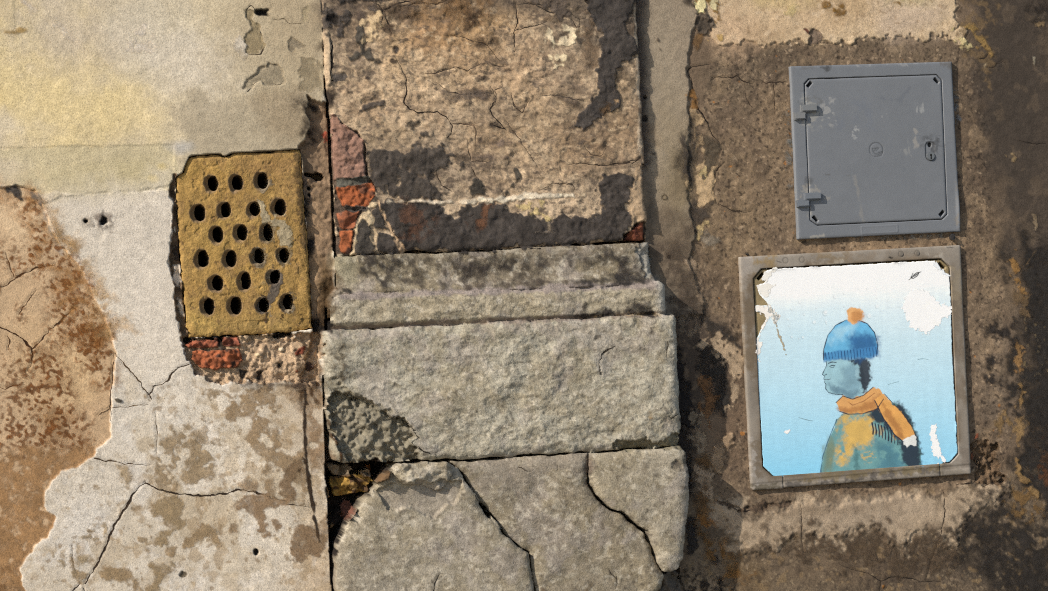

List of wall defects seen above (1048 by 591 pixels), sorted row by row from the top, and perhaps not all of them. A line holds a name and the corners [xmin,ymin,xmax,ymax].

crack [373,0,447,25]
flaking render [693,0,723,50]
crack [397,0,641,191]
crack [0,253,69,390]
flaking render [169,173,326,386]
flaking render [304,114,585,256]
peeling [619,165,652,279]
crack [71,353,307,591]
spalling [324,392,437,556]
damp [685,517,699,555]
damp [677,570,726,591]
damp [762,516,963,580]